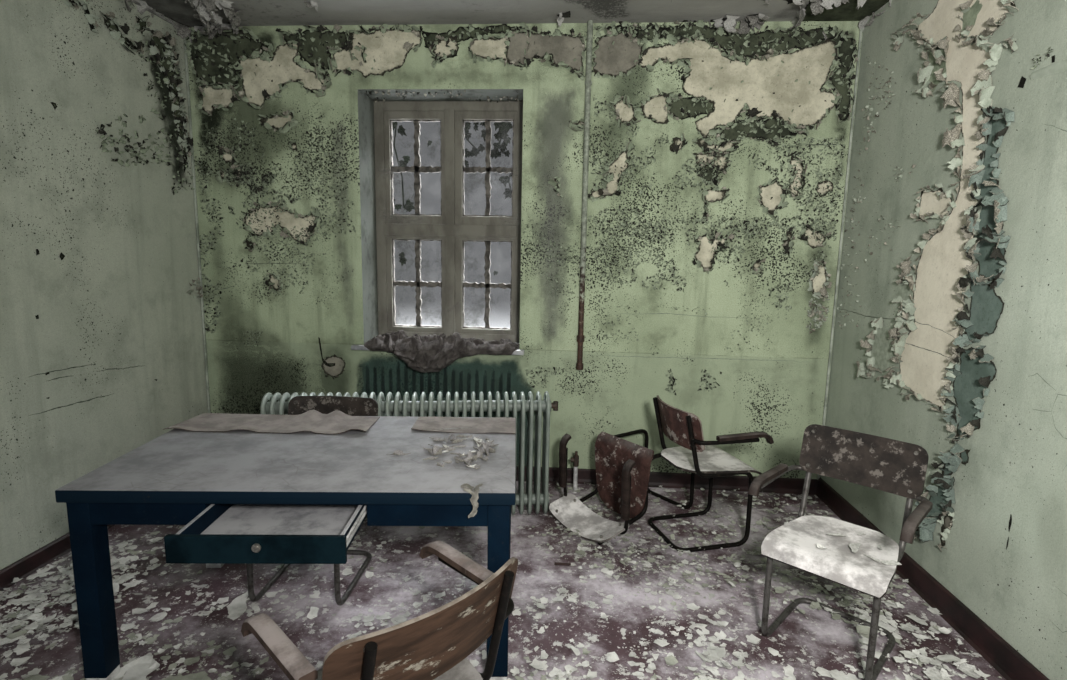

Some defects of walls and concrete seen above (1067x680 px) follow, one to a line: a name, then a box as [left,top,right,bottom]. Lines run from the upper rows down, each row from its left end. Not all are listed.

peeling [62,0,892,274]
water stain [541,100,568,332]
peeling [781,224,832,299]
peeling [856,0,1019,552]